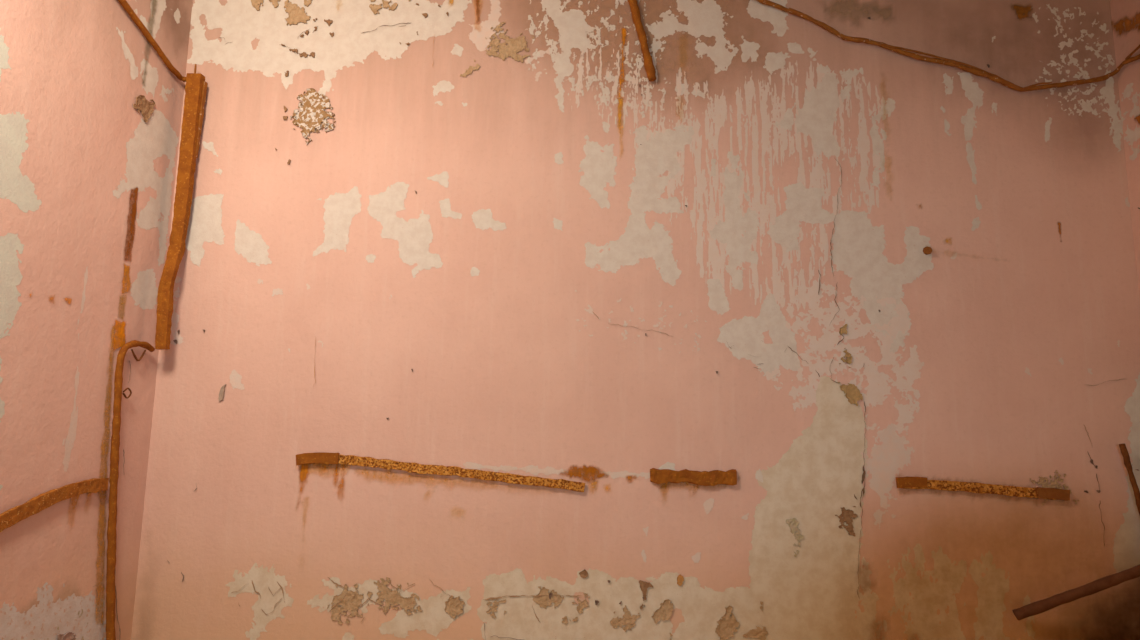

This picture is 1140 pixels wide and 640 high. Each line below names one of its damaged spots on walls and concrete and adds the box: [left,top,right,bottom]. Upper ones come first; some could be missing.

rust [618,28,626,129]
peeling [1032,4,1140,161]
peeling [0,111,42,213]
peeling [113,27,179,310]
peeling [0,233,24,339]
peeling [134,0,934,640]
rust [0,187,138,623]
rust [296,452,608,492]
rust [650,468,737,492]
rust [896,477,1070,501]
peeling [0,582,106,640]
water stain [1090,590,1140,640]